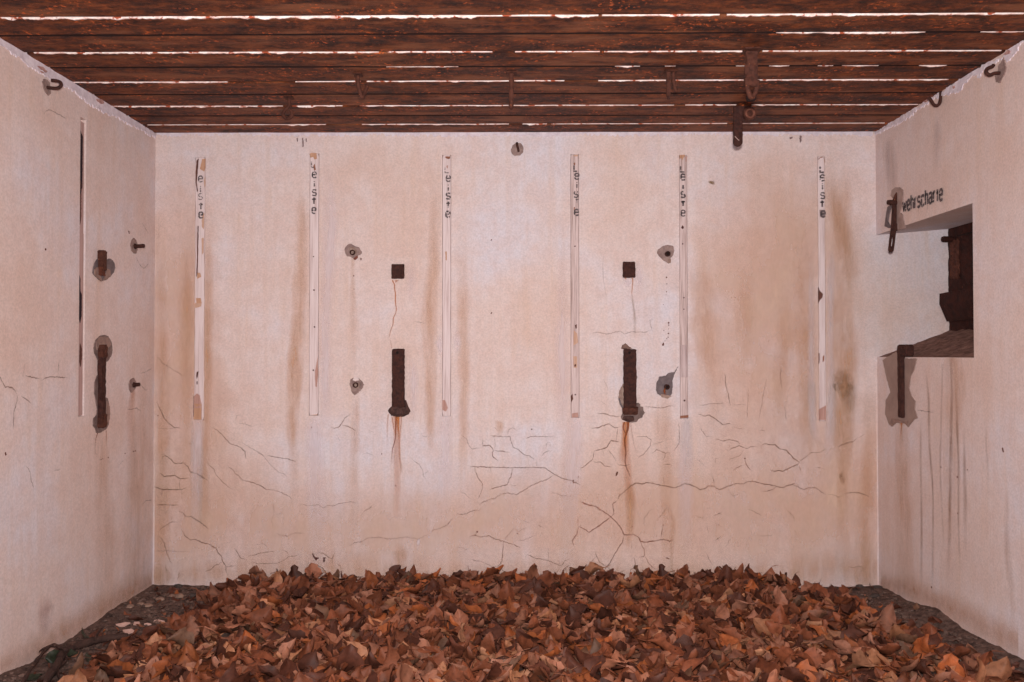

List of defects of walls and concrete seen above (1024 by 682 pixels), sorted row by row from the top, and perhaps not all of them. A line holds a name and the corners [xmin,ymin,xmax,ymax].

crack [484,425,671,566]
crack [631,416,798,491]